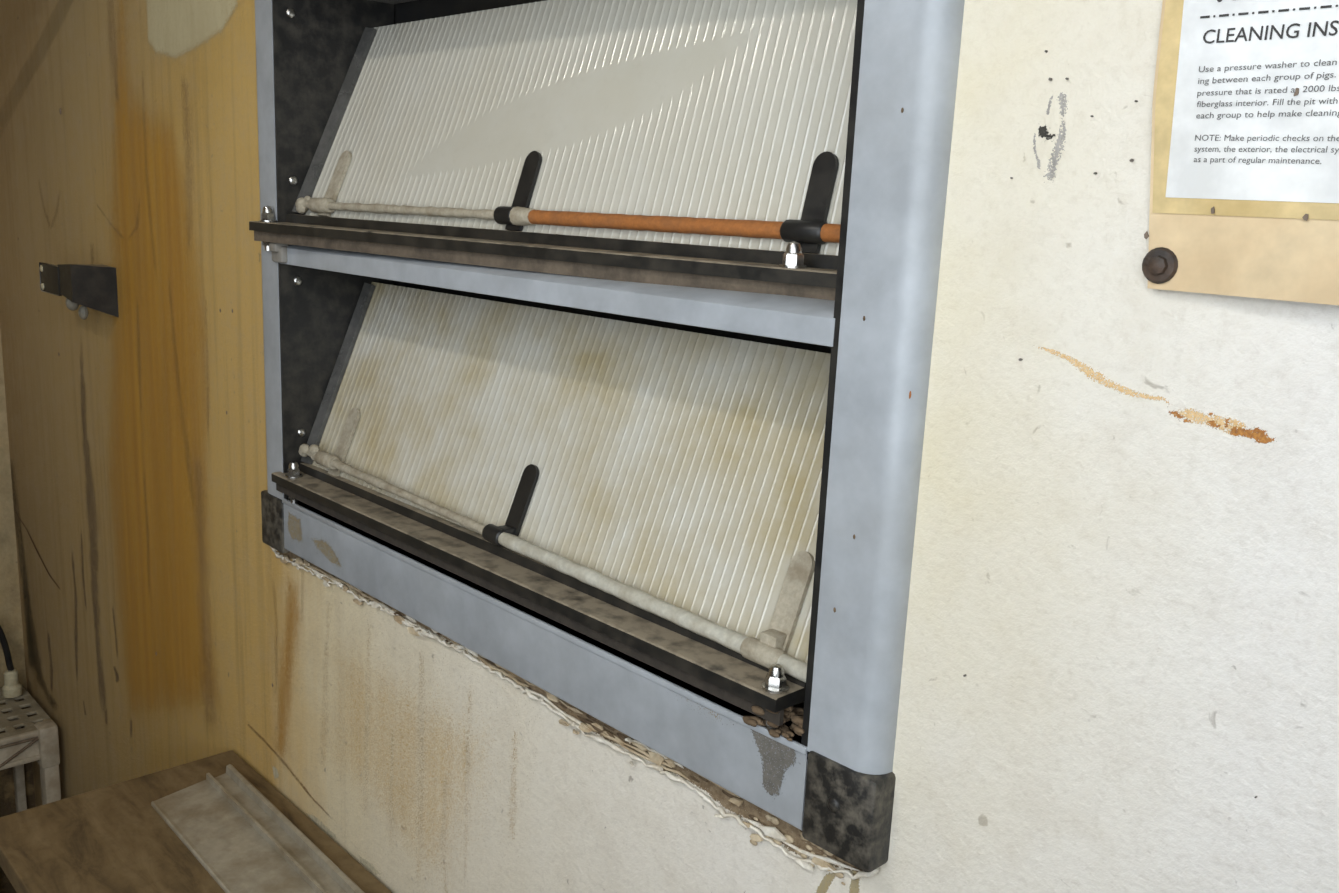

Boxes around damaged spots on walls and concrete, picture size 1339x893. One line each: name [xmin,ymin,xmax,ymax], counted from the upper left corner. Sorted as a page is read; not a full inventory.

water stain [71,0,233,756]
rust [1038,347,1275,444]
water stain [10,458,63,713]
spalling [271,547,879,885]
water stain [816,873,835,893]
water stain [849,870,860,893]